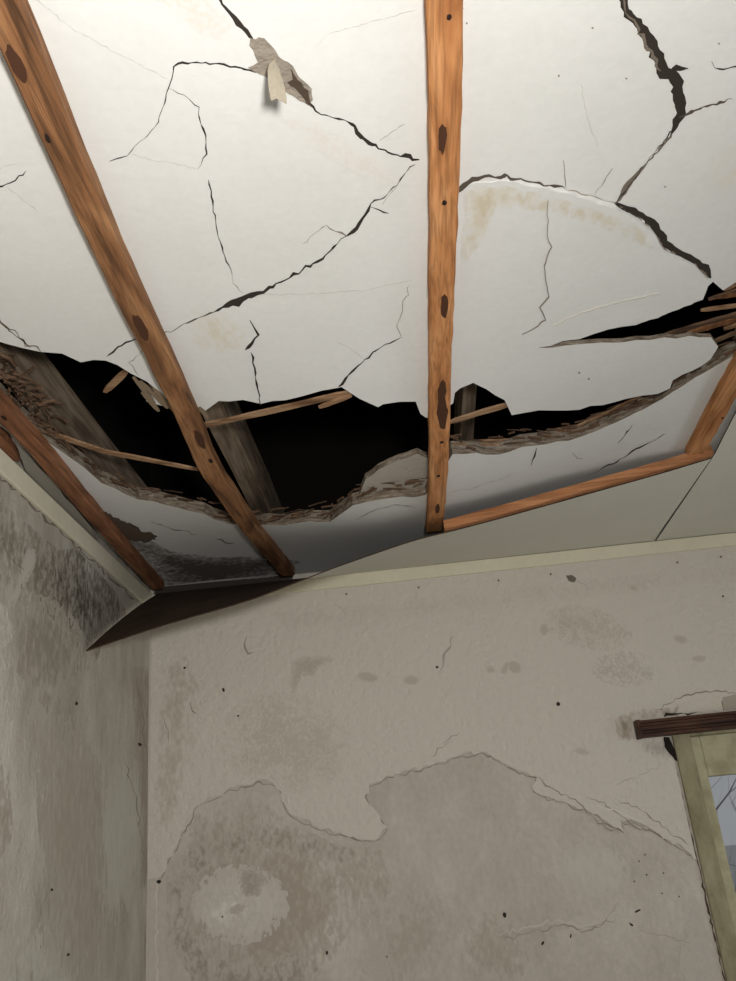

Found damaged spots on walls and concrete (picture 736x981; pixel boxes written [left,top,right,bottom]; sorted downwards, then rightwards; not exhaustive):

crack [0,164,37,211]
crack [38,0,419,406]
crack [459,0,728,335]
spalling [105,513,158,543]
leakage [0,501,126,981]
leakage [220,690,350,794]
leakage [165,795,539,981]
peeling [138,546,736,884]